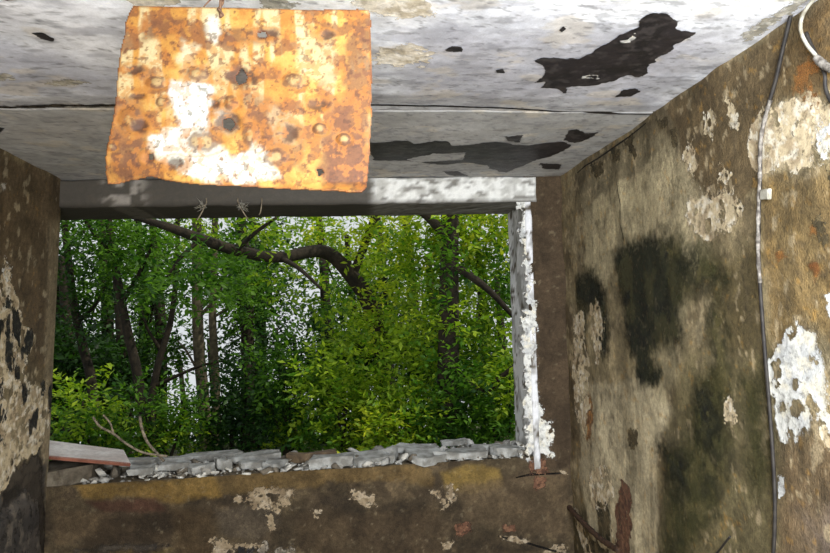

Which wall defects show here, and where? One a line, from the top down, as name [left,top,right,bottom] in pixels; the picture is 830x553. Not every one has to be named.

peeling [535,13,696,93]
peeling [370,129,599,176]
peeling [747,90,830,181]
peeling [685,161,744,242]
peeling [0,257,50,491]
peeling [516,202,555,491]
leakage [575,266,609,357]
leakage [628,428,638,450]
leakage [615,234,729,387]
leakage [695,386,722,450]
peeling [768,321,830,451]
peeling [208,482,295,553]